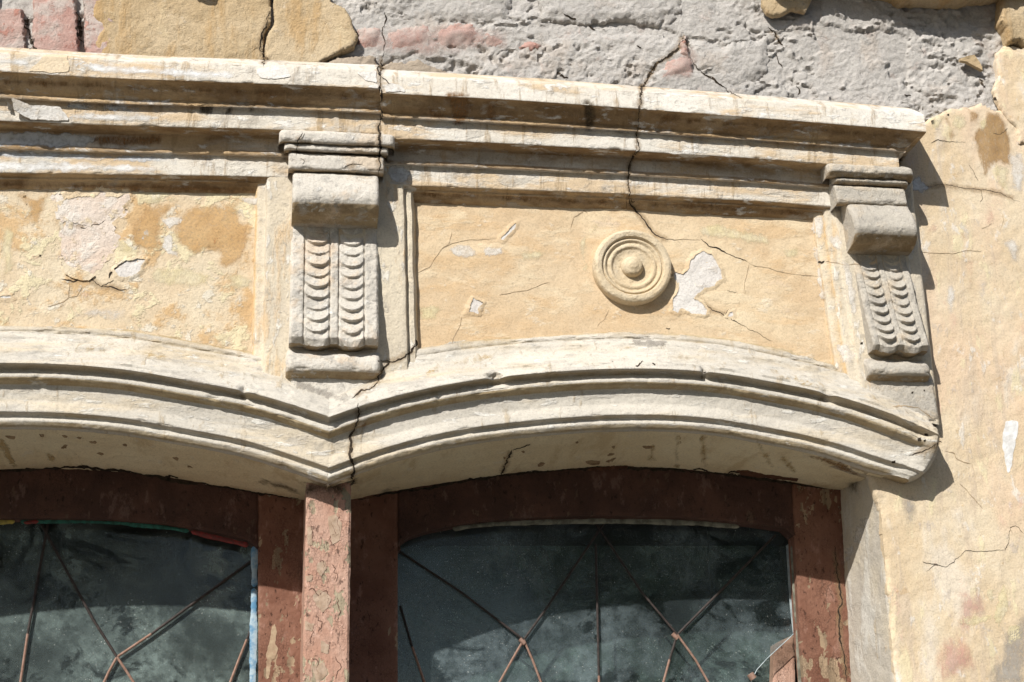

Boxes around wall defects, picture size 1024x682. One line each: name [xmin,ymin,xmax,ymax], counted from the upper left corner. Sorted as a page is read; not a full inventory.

flaking render [0,0,770,92]
crack [627,38,859,341]
crack [48,260,130,307]
flaking render [459,294,487,318]
flaking render [668,248,727,319]
crack [348,340,827,500]
crack [924,526,1023,569]